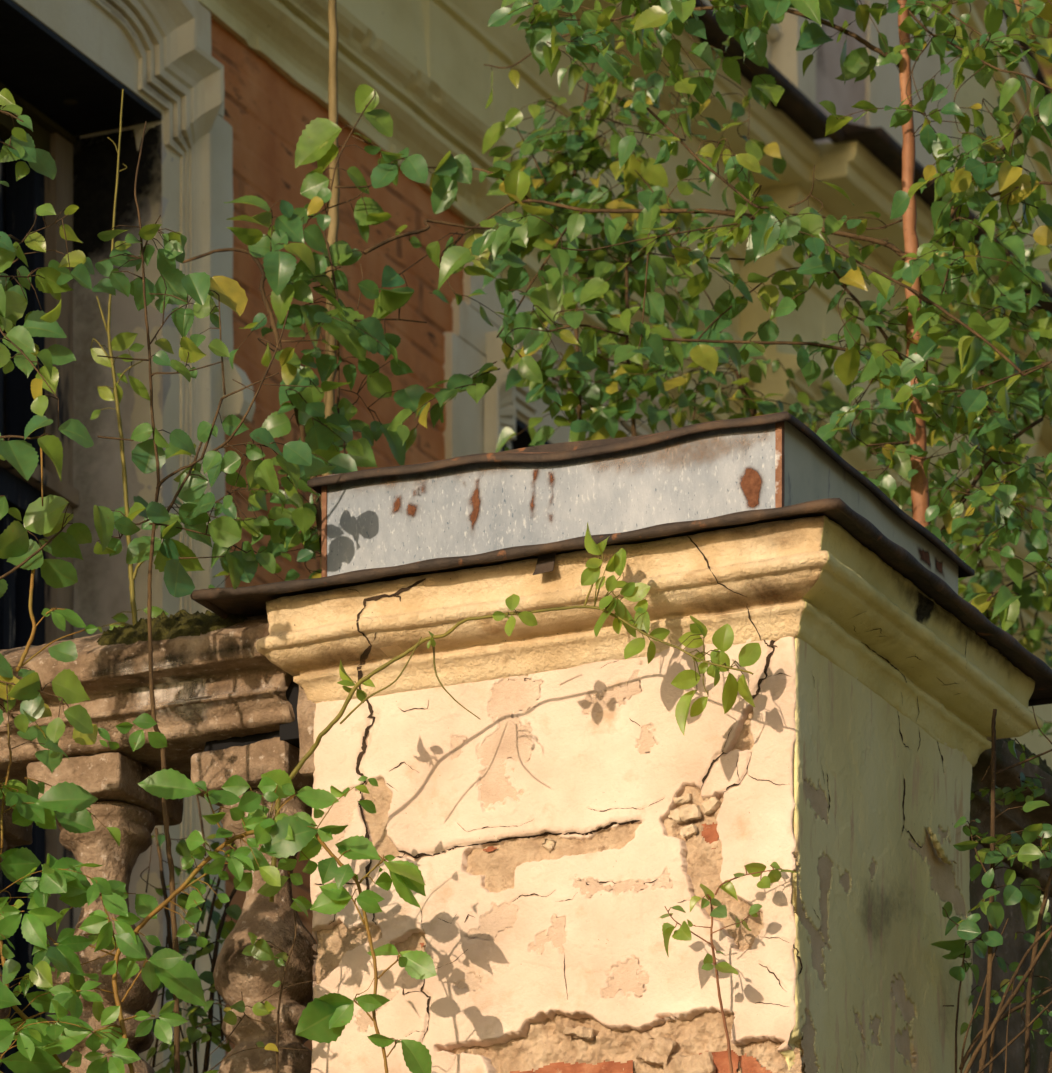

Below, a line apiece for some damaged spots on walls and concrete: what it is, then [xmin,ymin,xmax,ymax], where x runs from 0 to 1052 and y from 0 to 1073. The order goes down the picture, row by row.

corrosion [393,487,424,516]
corrosion [469,480,480,528]
corrosion [740,468,762,508]
crack [688,536,814,699]
crack [315,578,664,924]
peeling [476,675,543,808]
flaking render [732,710,754,751]
crack [701,729,787,793]
flaking render [466,822,642,940]
flaking render [664,785,764,951]
peeling [796,853,850,989]
flaking render [444,1010,819,1073]